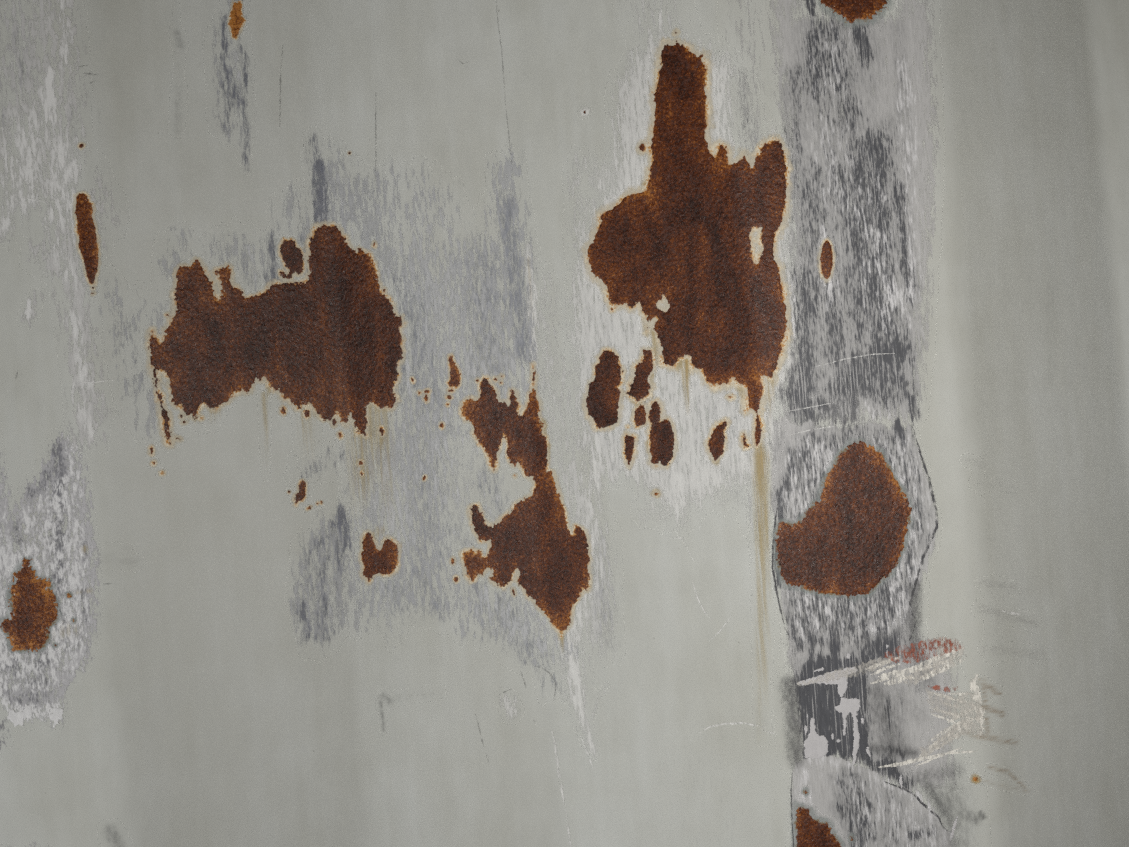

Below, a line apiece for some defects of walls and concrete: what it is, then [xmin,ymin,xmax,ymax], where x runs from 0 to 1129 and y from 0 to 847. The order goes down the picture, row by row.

peeling [212,0,249,164]
corrosion [820,0,891,26]
corrosion [73,191,101,296]
peeling [210,137,397,291]
corrosion [581,28,793,486]
peeling [0,0,172,749]
corrosion [145,221,593,642]
peeling [524,0,958,847]
corrosion [0,557,76,653]
peeling [289,504,358,643]
corrosion [759,439,912,600]
corrosion [793,788,854,847]